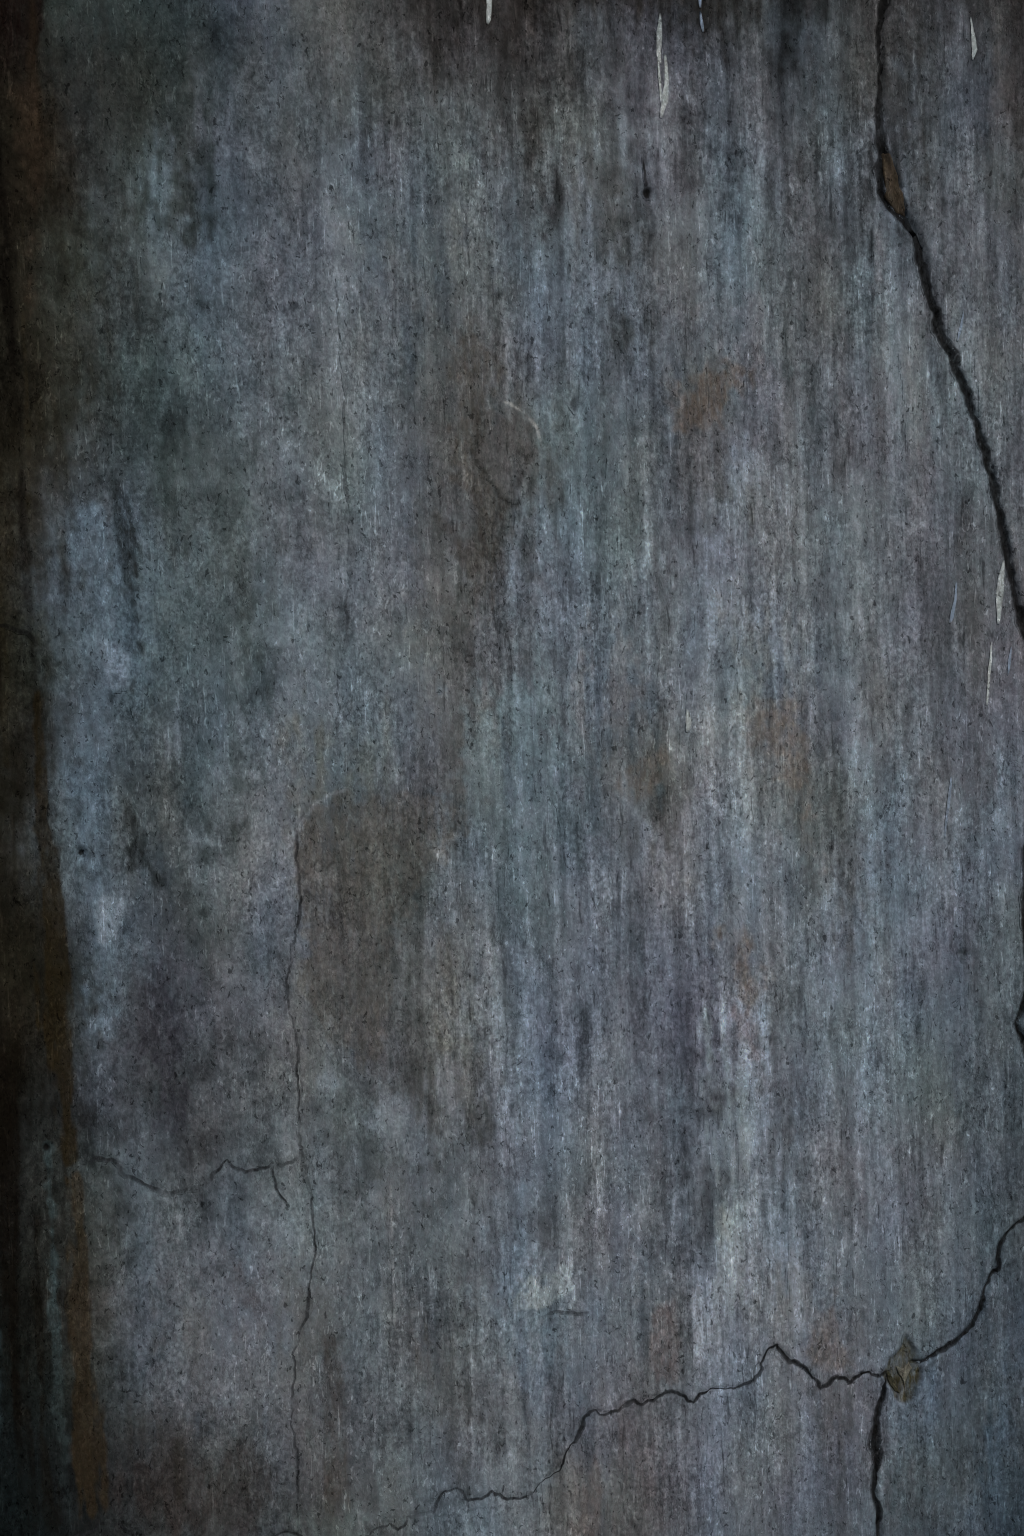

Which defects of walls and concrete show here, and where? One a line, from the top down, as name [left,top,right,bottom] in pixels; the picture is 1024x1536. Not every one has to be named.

spalling [881,144,910,220]
crack [872,0,1024,641]
crack [0,623,39,646]
crack [74,285,352,1536]
crack [1016,843,1024,949]
crack [1014,991,1024,1056]
crack [366,1216,1024,1536]
spalling [880,1334,925,1407]